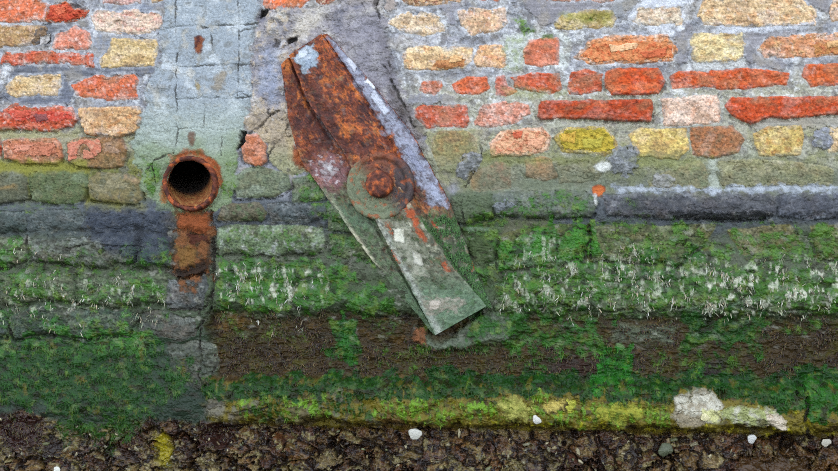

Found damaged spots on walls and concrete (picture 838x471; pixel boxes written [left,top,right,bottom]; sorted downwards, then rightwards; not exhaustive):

rust [171,132,223,185]
rust [293,146,308,171]
damp [611,159,838,222]
damp [86,207,167,261]
rust [162,191,217,293]
rust [413,328,426,345]
damp [543,398,576,413]
damp [673,389,786,430]